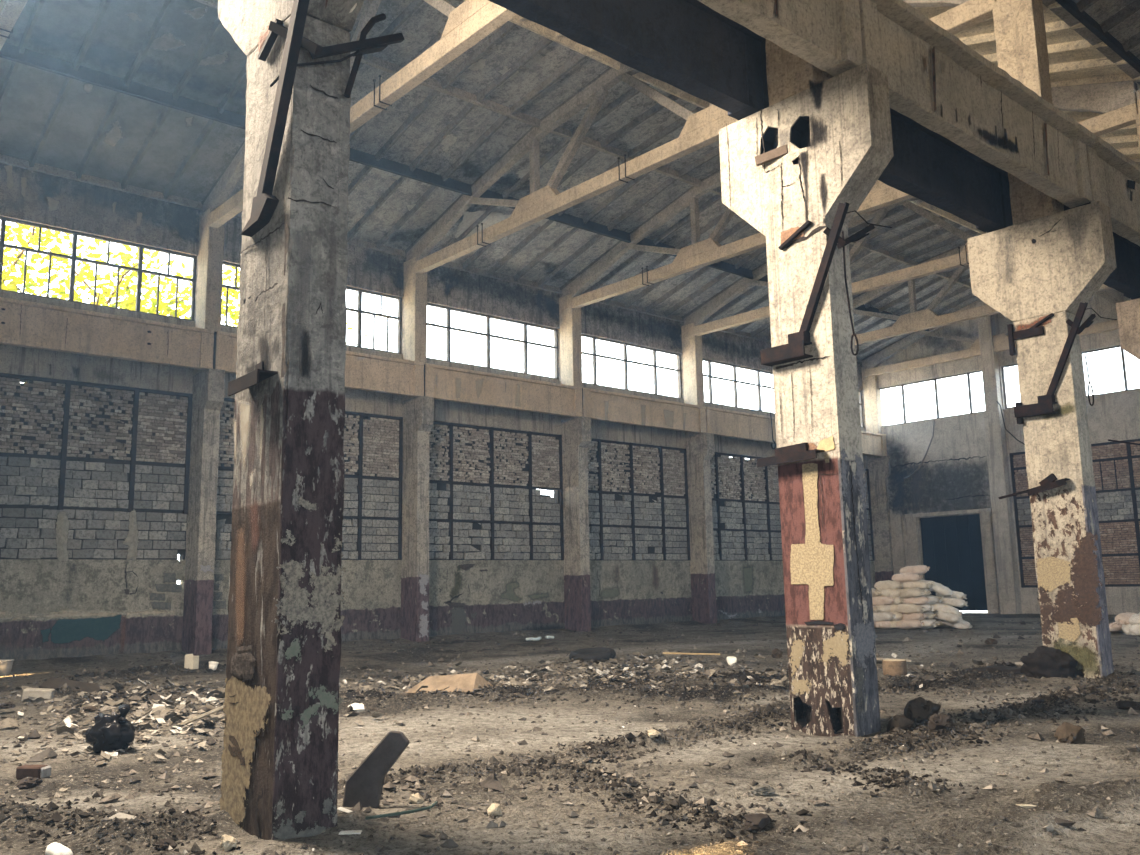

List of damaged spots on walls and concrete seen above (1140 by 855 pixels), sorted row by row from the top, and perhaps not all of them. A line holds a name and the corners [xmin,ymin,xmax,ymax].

peeling [281,529,295,546]
peeling [298,497,319,512]
peeling [271,533,346,661]
peeling [789,436,877,733]
peeling [1037,531,1107,647]
peeling [219,644,345,829]
peeling [272,794,336,840]